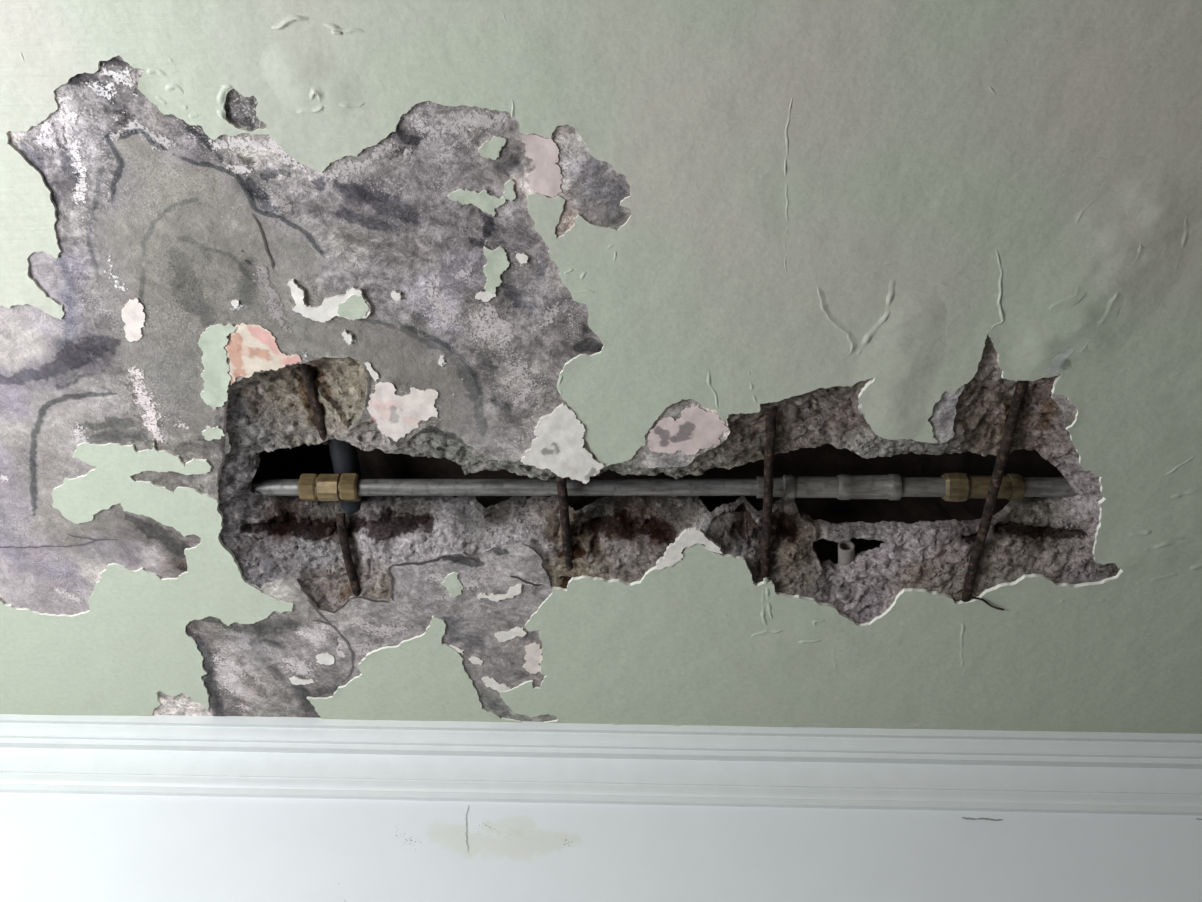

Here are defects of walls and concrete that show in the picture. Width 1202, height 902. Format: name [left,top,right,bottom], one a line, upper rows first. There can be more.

peeling [0,55,1120,722]
corrosion [557,509,676,559]
corrosion [730,503,798,548]
corrosion [992,521,1087,541]